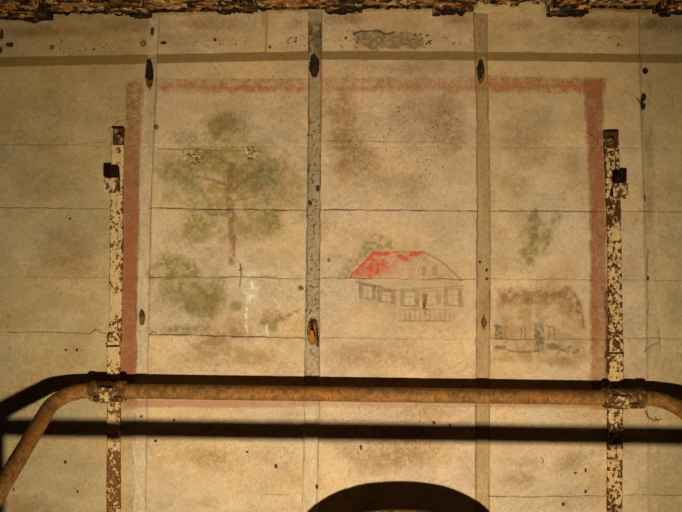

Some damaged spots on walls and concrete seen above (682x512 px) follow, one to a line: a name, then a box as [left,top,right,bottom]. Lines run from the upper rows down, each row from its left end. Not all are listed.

corrosion [307,313,319,347]